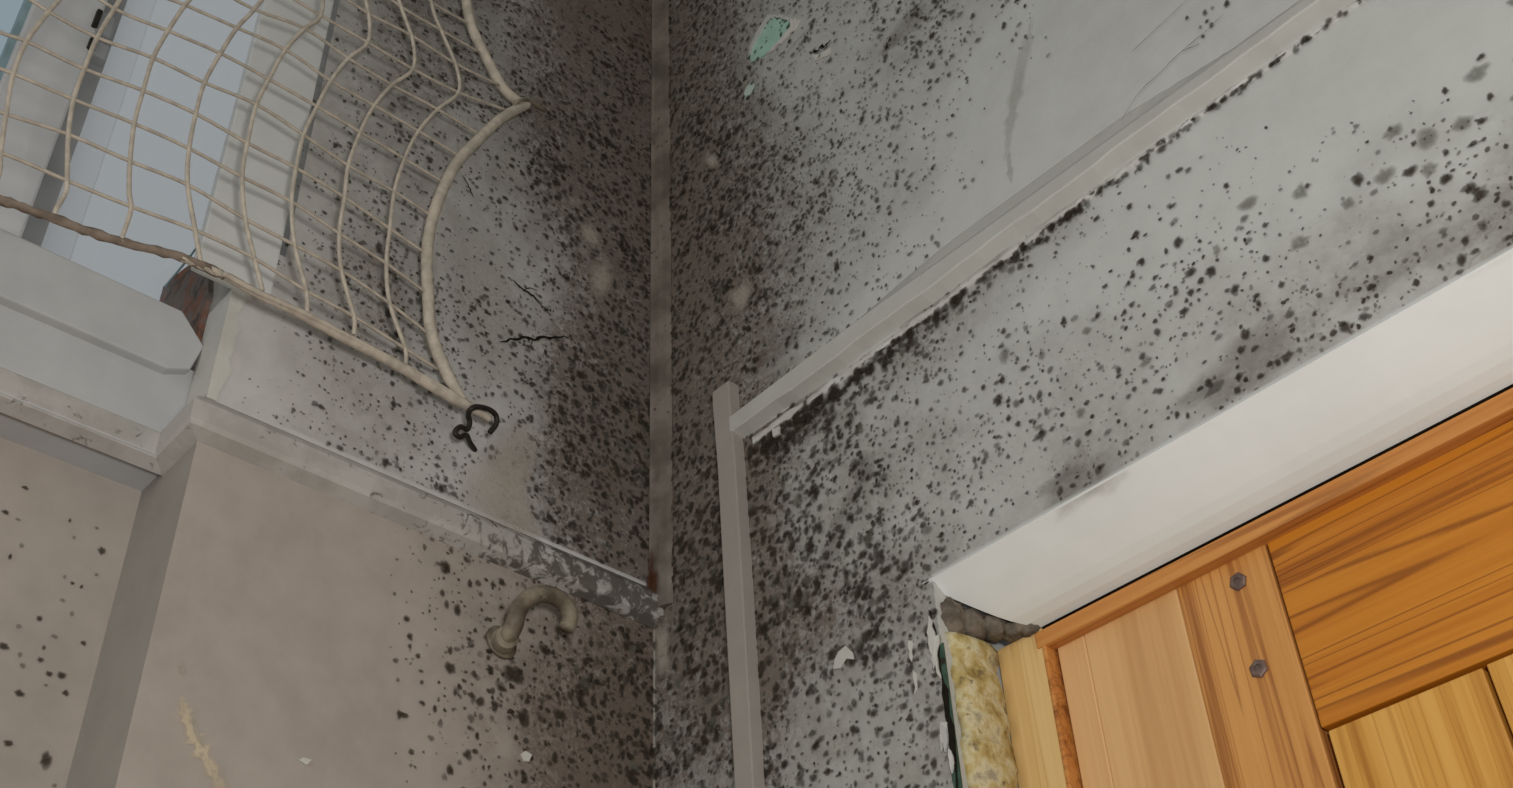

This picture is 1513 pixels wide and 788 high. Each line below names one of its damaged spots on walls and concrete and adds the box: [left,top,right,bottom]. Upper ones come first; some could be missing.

water stain [0,636,68,696]
water stain [258,0,985,788]
water stain [743,0,1513,788]